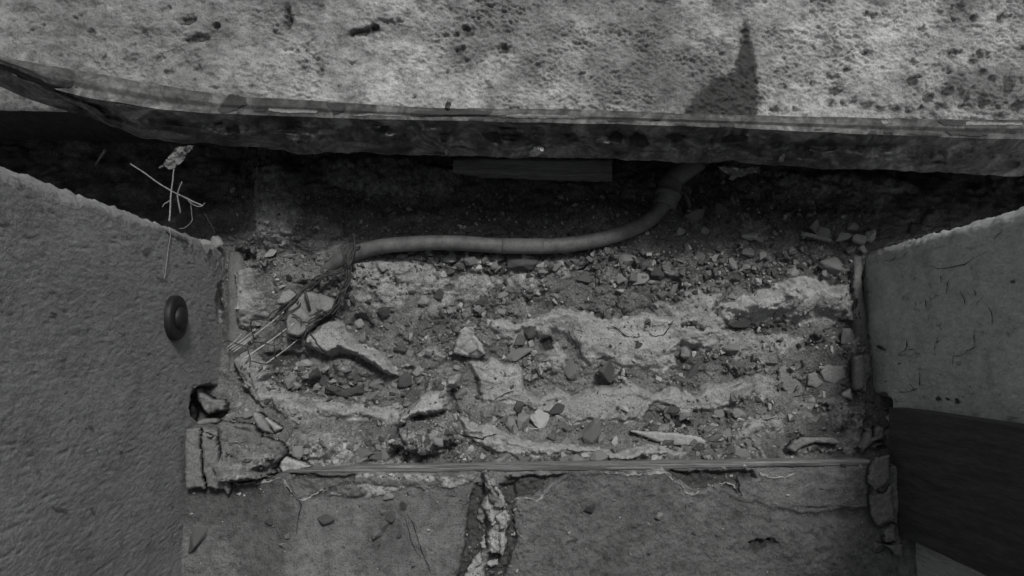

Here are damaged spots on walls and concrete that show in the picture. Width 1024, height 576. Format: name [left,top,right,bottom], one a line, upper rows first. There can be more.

spalling [190,387,230,414]
peeling [185,427,443,501]